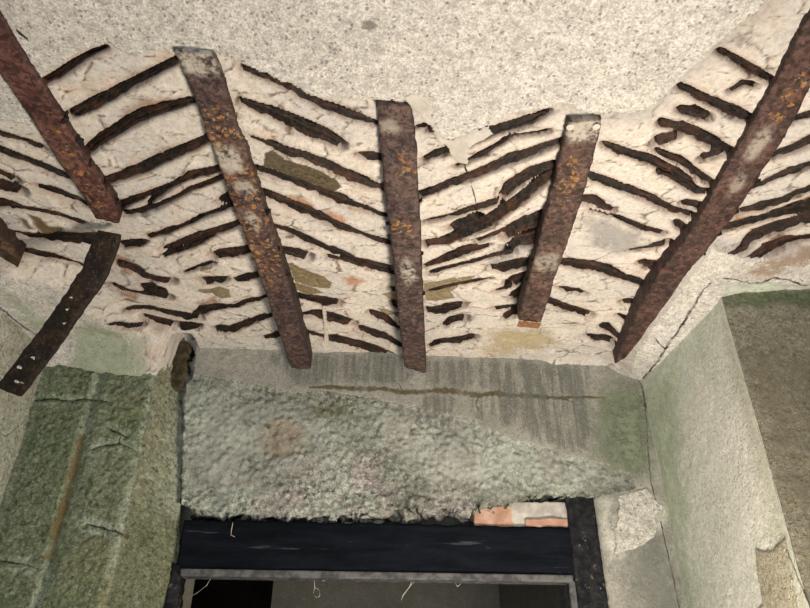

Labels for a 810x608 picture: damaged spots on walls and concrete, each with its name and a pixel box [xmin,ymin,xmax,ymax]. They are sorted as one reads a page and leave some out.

spalling [0,41,663,555]
spalling [411,0,810,376]
crack [639,277,806,500]
crack [660,522,680,608]
flaking render [755,538,797,608]